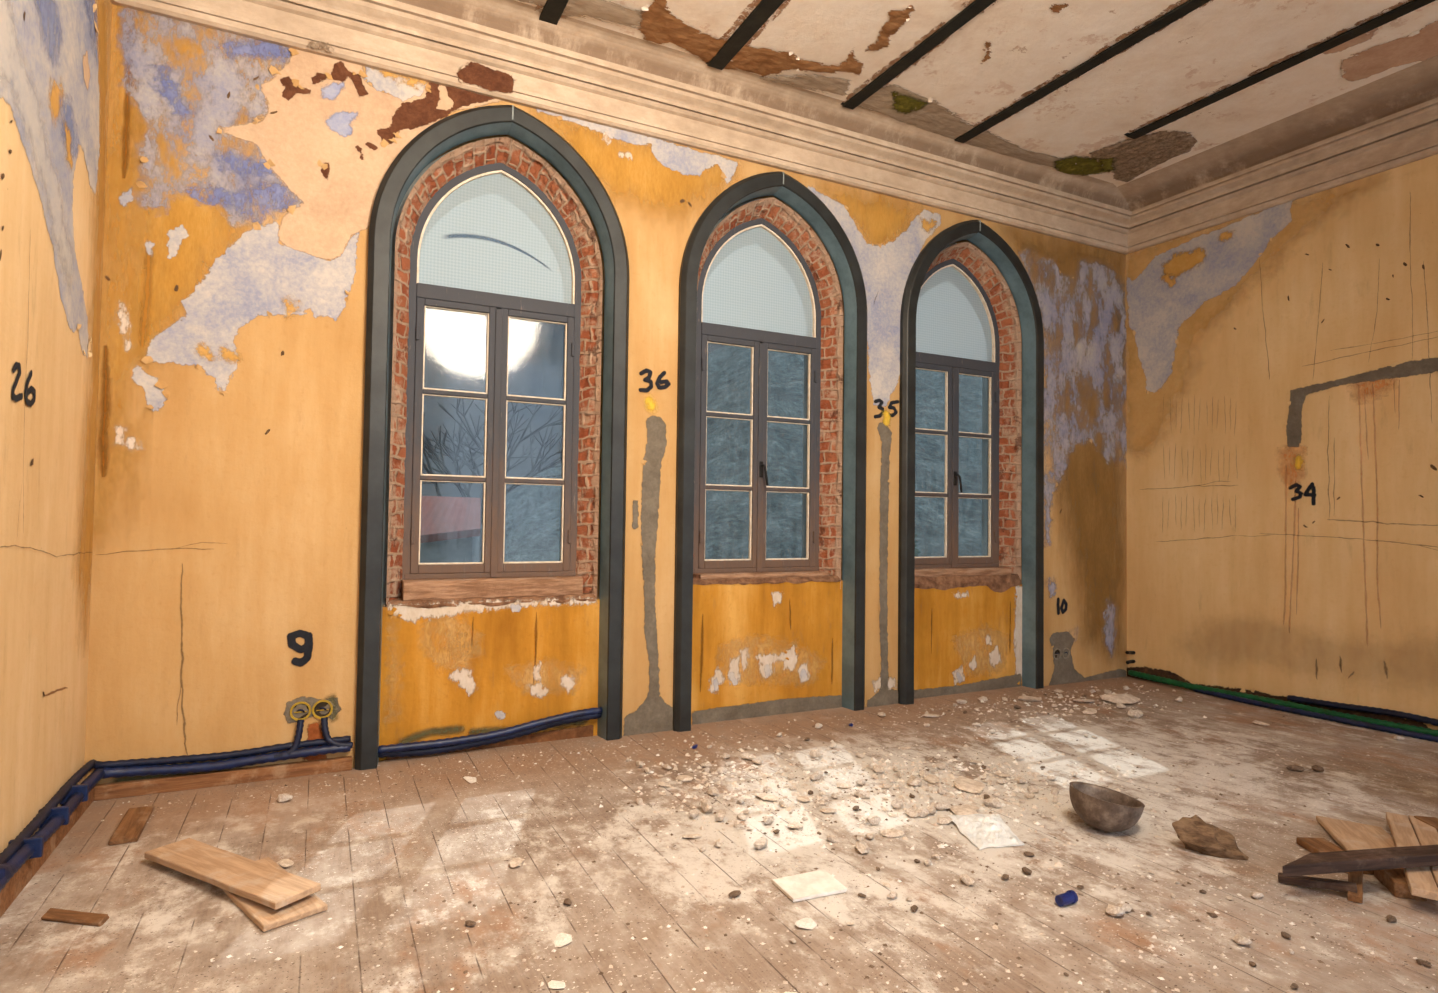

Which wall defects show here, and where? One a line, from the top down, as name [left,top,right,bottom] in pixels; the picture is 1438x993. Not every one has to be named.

peeling [0,0,100,358]
leakage [79,0,265,623]
flaking render [118,8,517,412]
peeling [807,186,941,407]
spalling [537,0,1230,183]
peeling [1020,201,1293,544]
peeling [1248,0,1438,81]
crack [2,459,226,755]
peeling [449,635,476,696]
peeling [385,593,596,624]
peeling [710,645,810,693]
spalling [915,574,1022,685]